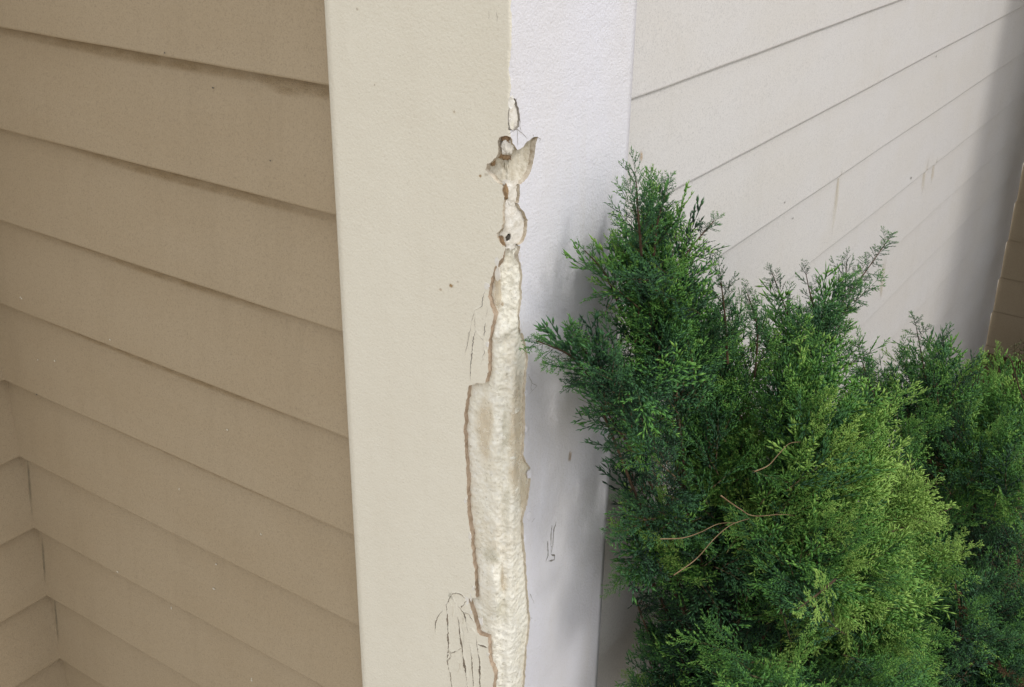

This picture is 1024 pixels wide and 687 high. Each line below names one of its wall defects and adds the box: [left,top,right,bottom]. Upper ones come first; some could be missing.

crack [462,291,489,382]
spalling [463,95,538,687]
crack [434,590,488,687]